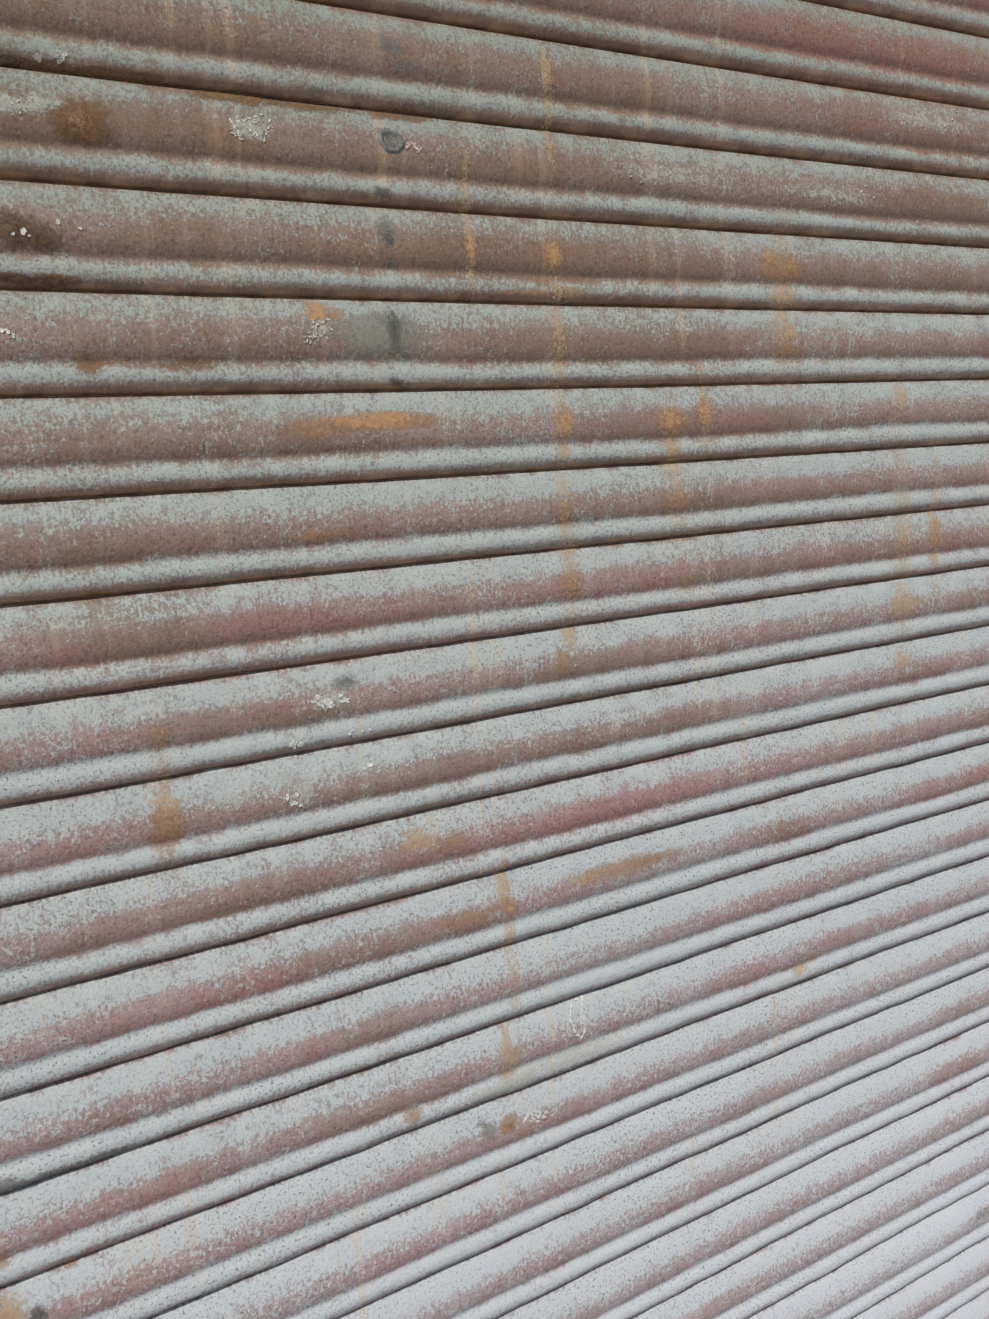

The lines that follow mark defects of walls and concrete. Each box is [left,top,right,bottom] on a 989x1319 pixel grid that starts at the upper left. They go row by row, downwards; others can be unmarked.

rust [49,100,113,147]
rust [0,212,62,253]
rust [295,410,435,440]
rust [659,395,712,433]